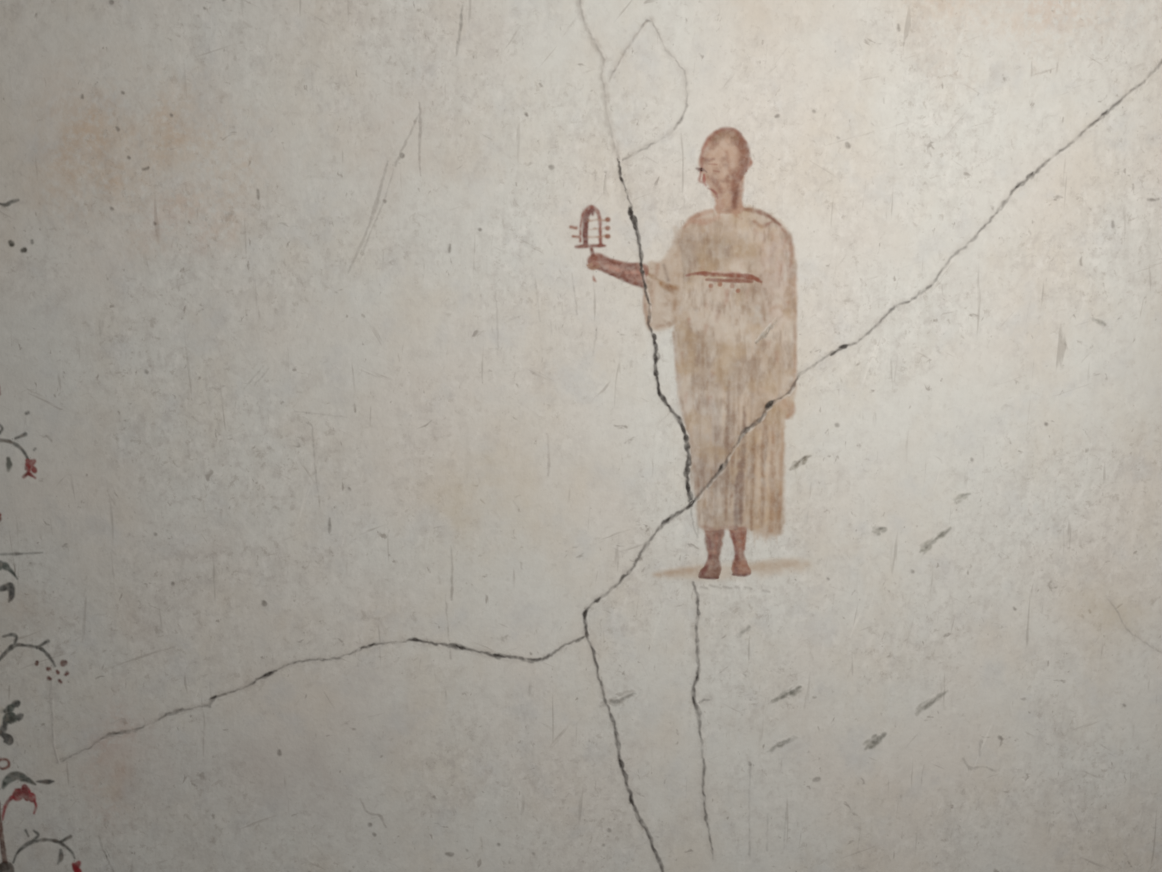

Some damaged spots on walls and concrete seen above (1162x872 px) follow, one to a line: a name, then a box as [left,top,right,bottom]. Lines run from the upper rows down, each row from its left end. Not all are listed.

crack [573,0,1162,634]
crack [45,629,668,872]
crack [688,579,719,862]